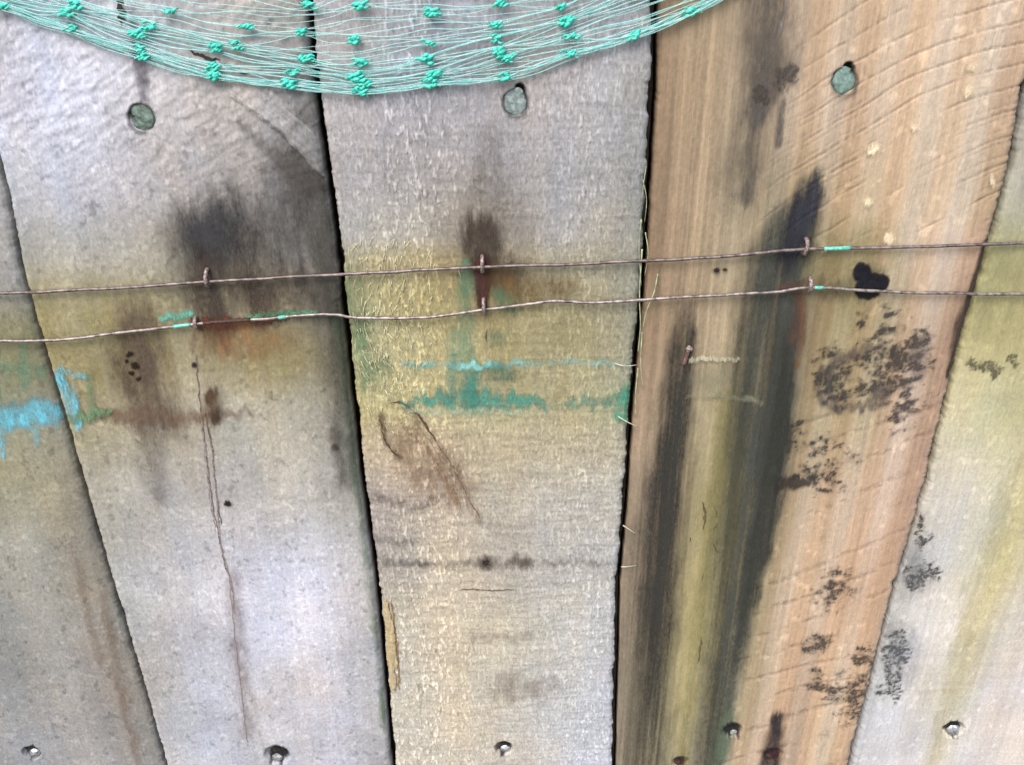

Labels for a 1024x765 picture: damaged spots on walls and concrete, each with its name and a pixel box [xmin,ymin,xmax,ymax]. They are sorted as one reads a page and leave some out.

water stain [746,0,799,146]
corrosion [191,313,290,353]
water stain [177,193,305,344]
water stain [463,215,509,286]
corrosion [474,256,535,309]
water stain [811,306,936,435]
crack [378,401,480,518]
water stain [696,170,858,765]
crack [196,354,248,747]
water stain [637,315,696,765]
water stain [903,563,941,591]
water stain [807,630,912,724]